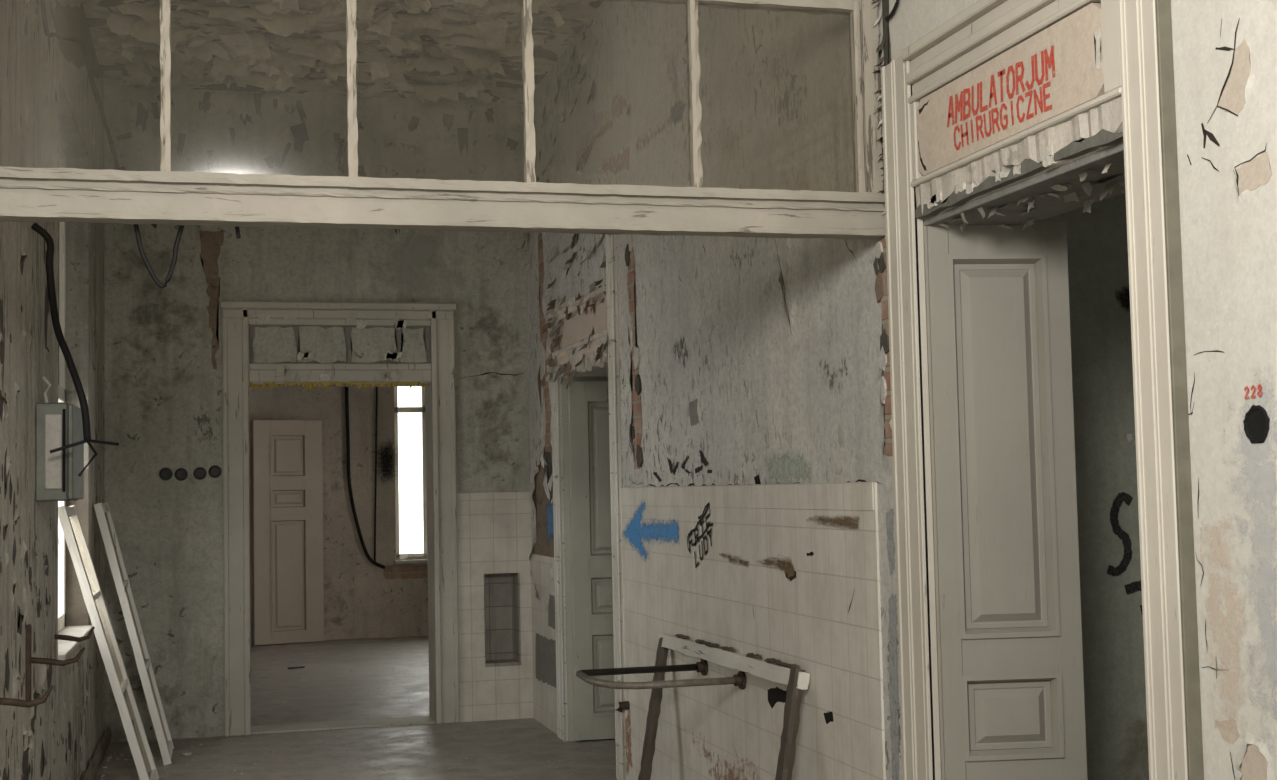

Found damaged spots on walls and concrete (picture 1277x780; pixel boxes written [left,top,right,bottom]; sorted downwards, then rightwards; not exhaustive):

peeling [99,0,565,177]
flaking render [575,83,637,185]
peeling [1207,18,1255,123]
peeling [1201,146,1272,205]
peeling [0,377,20,425]
peeling [0,287,50,364]
flaking render [190,225,235,380]
flaking render [529,232,608,688]
flaking render [625,234,644,473]
peeling [0,443,89,780]